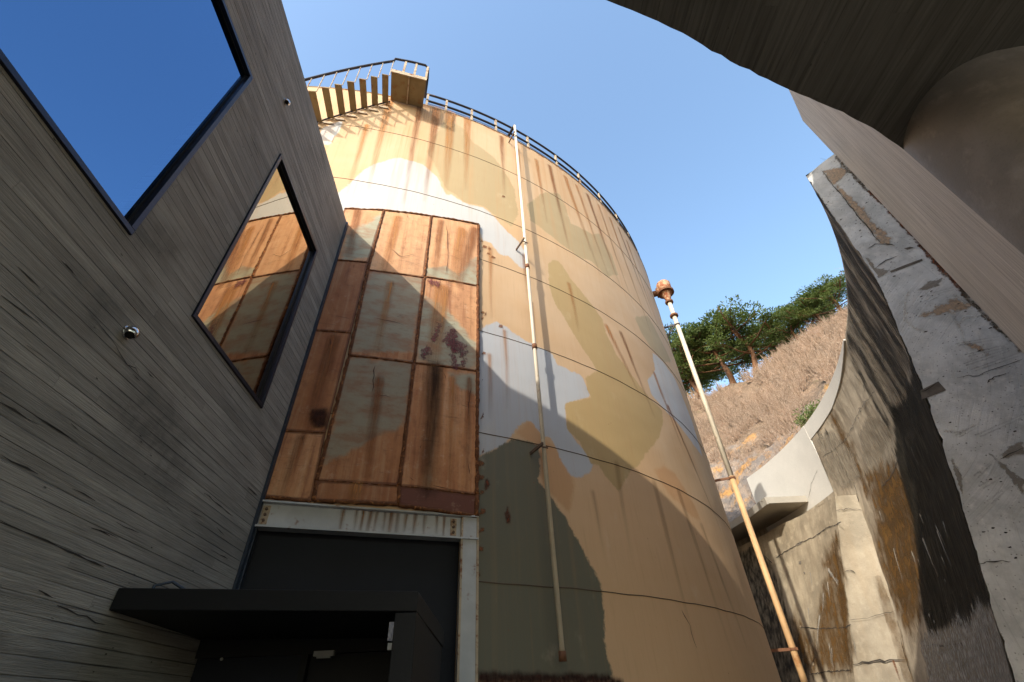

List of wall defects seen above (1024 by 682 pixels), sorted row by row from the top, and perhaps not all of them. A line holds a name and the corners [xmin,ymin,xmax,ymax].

rust [415,107,471,147]
rust [536,161,637,268]
rust [311,409,328,427]
rust [426,364,454,462]
leakage [816,193,1014,682]
crack [765,482,860,563]
leakage [739,535,855,682]